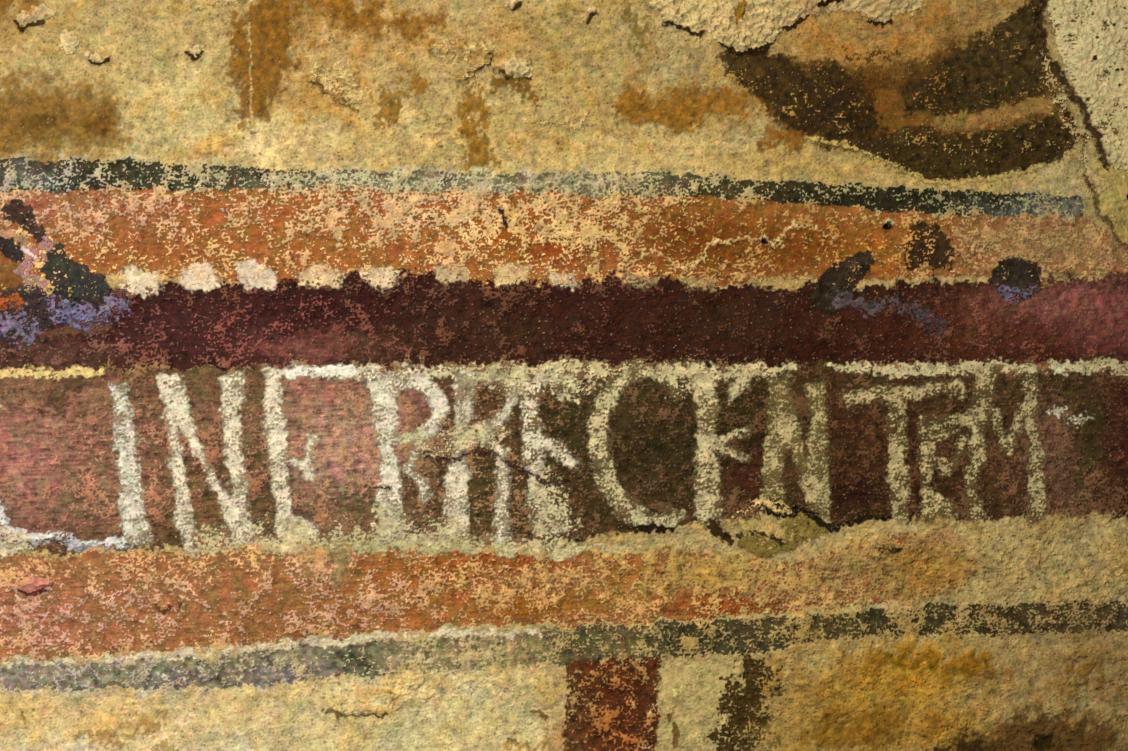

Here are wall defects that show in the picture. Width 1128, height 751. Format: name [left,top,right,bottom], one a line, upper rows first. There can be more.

crack [1035,0,1128,251]
flaking render [738,512,826,561]